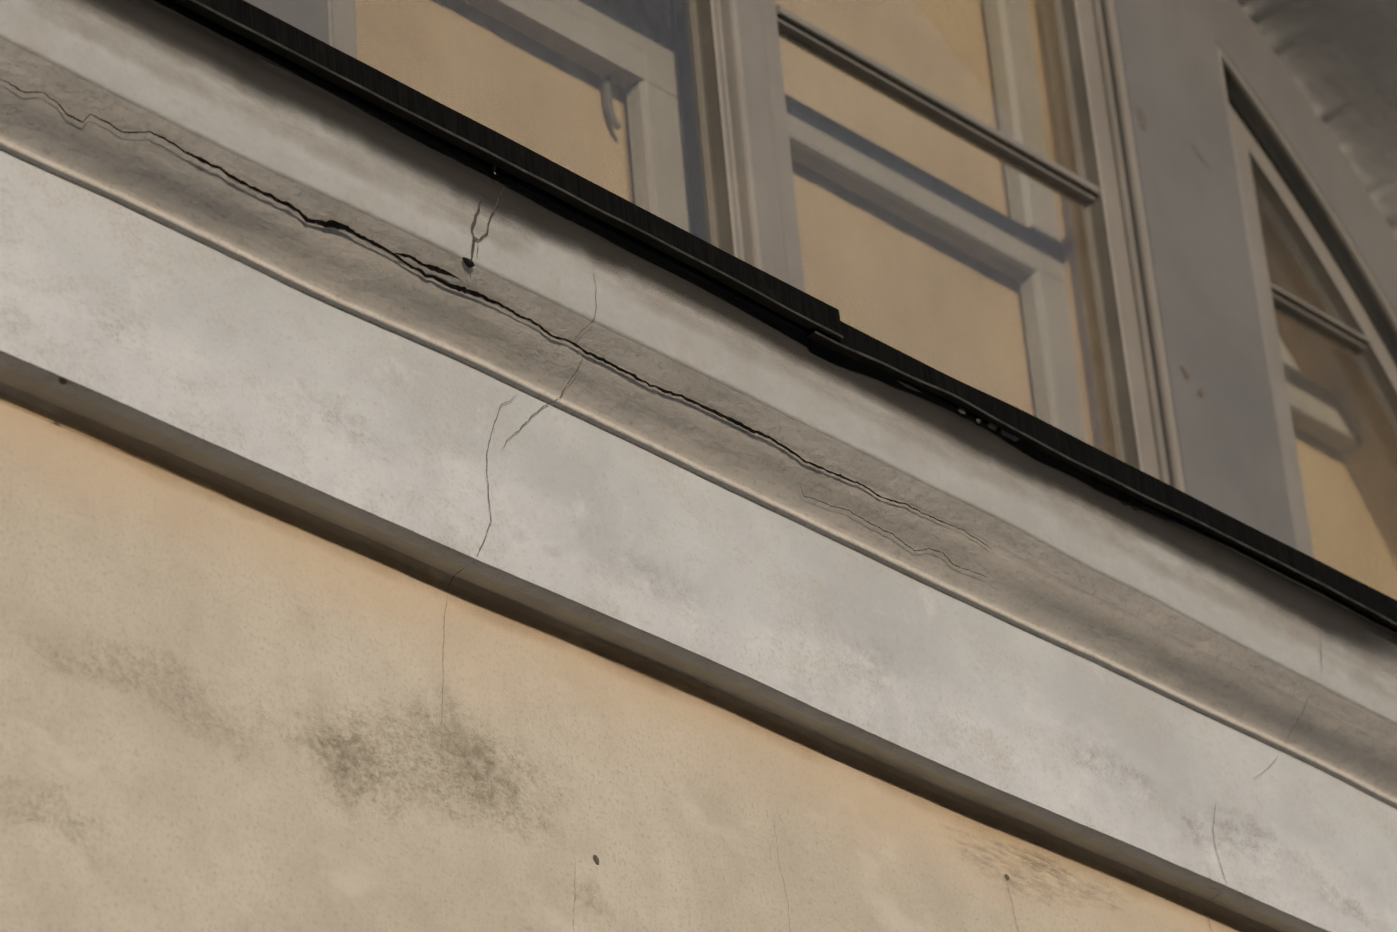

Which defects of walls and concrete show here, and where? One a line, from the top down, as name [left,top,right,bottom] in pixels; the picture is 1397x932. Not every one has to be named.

crack [1,79,995,734]